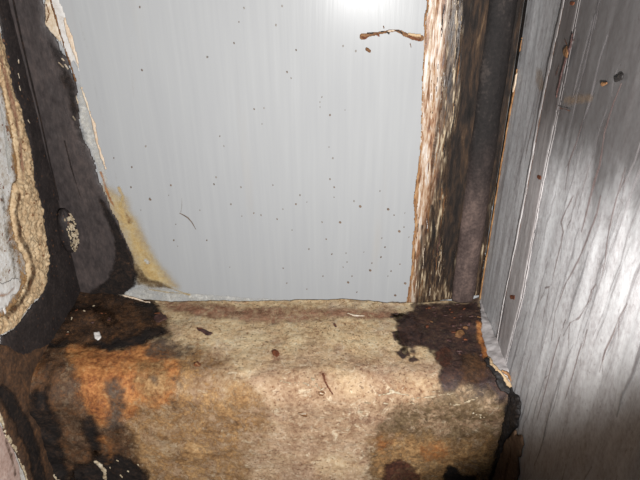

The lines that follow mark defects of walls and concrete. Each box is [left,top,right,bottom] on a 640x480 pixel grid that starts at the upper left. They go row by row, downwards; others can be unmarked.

peeling [44,0,113,204]
damp [429,0,489,292]
damp [482,0,528,257]
peeling [0,278,21,314]
damp [44,187,192,358]
damp [0,380,149,480]